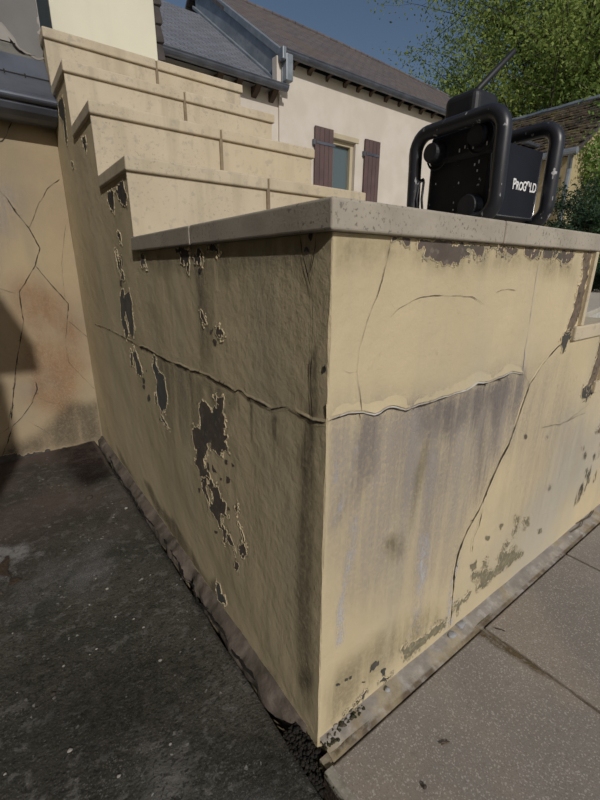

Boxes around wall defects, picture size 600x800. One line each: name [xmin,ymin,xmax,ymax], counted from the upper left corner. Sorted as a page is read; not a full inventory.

peeling [107,178,128,216]
peeling [114,229,170,432]
crack [0,180,326,456]
peeling [191,390,248,576]
peeling [390,236,593,354]
crack [448,268,564,629]
spalling [580,337,600,403]
peeling [399,514,530,663]